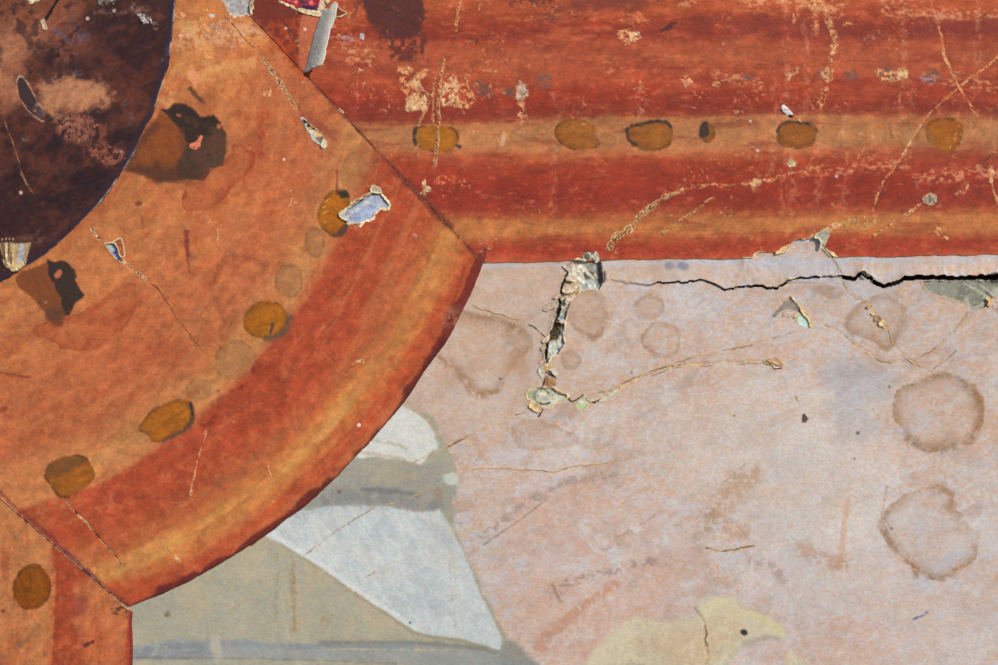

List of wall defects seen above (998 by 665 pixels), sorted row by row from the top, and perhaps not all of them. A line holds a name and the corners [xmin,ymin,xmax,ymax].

peeling [200,0,255,33]
peeling [280,0,364,73]
peeling [338,185,391,227]
crack [648,248,998,369]
peeling [525,386,599,417]